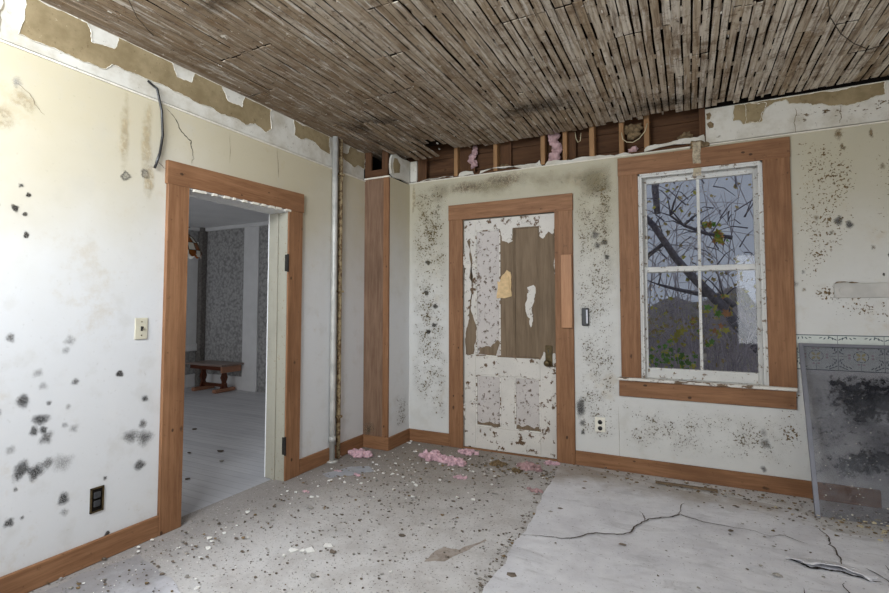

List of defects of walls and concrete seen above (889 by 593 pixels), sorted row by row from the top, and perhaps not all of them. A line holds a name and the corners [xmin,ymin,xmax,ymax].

peeling [18,0,272,133]
peeling [733,81,886,124]
peeling [293,120,330,154]
damp [797,143,856,281]
damp [413,191,446,418]
damp [577,174,615,438]
damp [816,288,888,322]
damp [30,415,51,441]
damp [624,404,802,466]
damp [14,459,51,491]
crack [525,503,889,593]